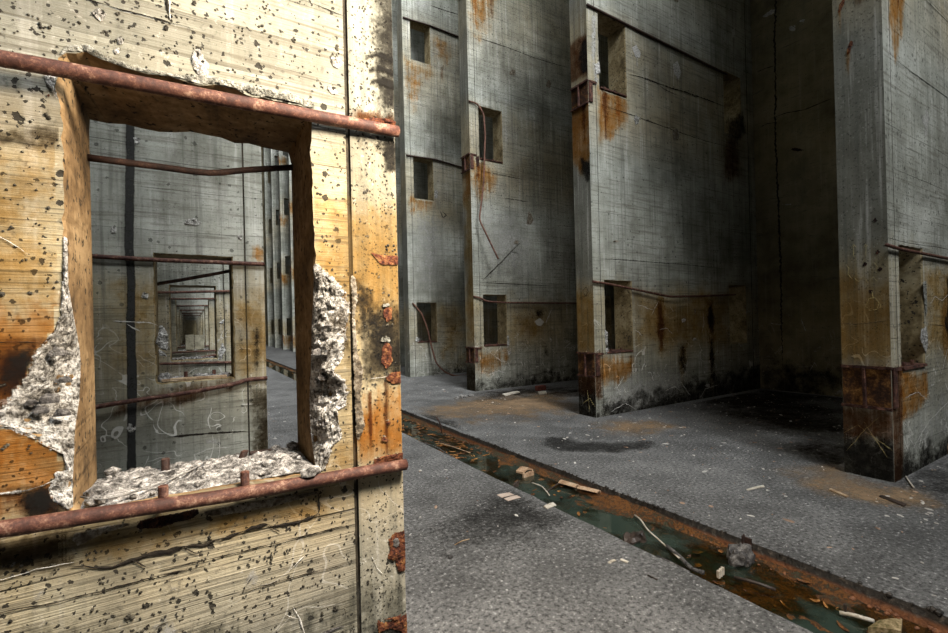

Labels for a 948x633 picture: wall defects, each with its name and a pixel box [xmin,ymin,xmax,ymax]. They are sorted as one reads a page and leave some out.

crack [758,0,832,366]
spalling [0,237,81,510]
spalling [309,263,365,471]
damp [428,395,557,425]
rust [377,614,407,633]
rust [388,530,406,572]